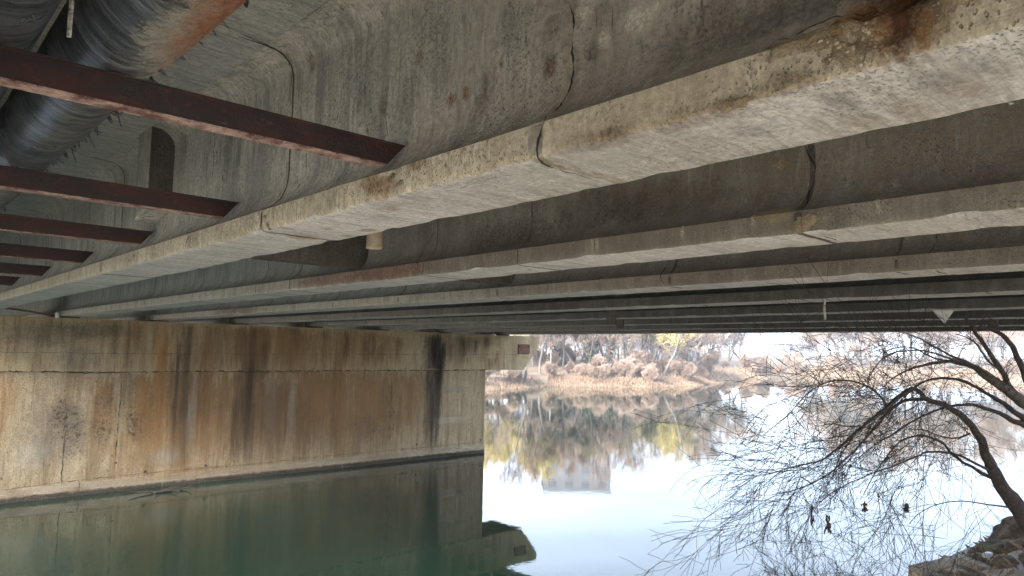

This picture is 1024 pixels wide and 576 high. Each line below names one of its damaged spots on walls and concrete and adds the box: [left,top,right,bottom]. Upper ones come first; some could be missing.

crack [536,1,613,179]
crack [794,146,848,243]